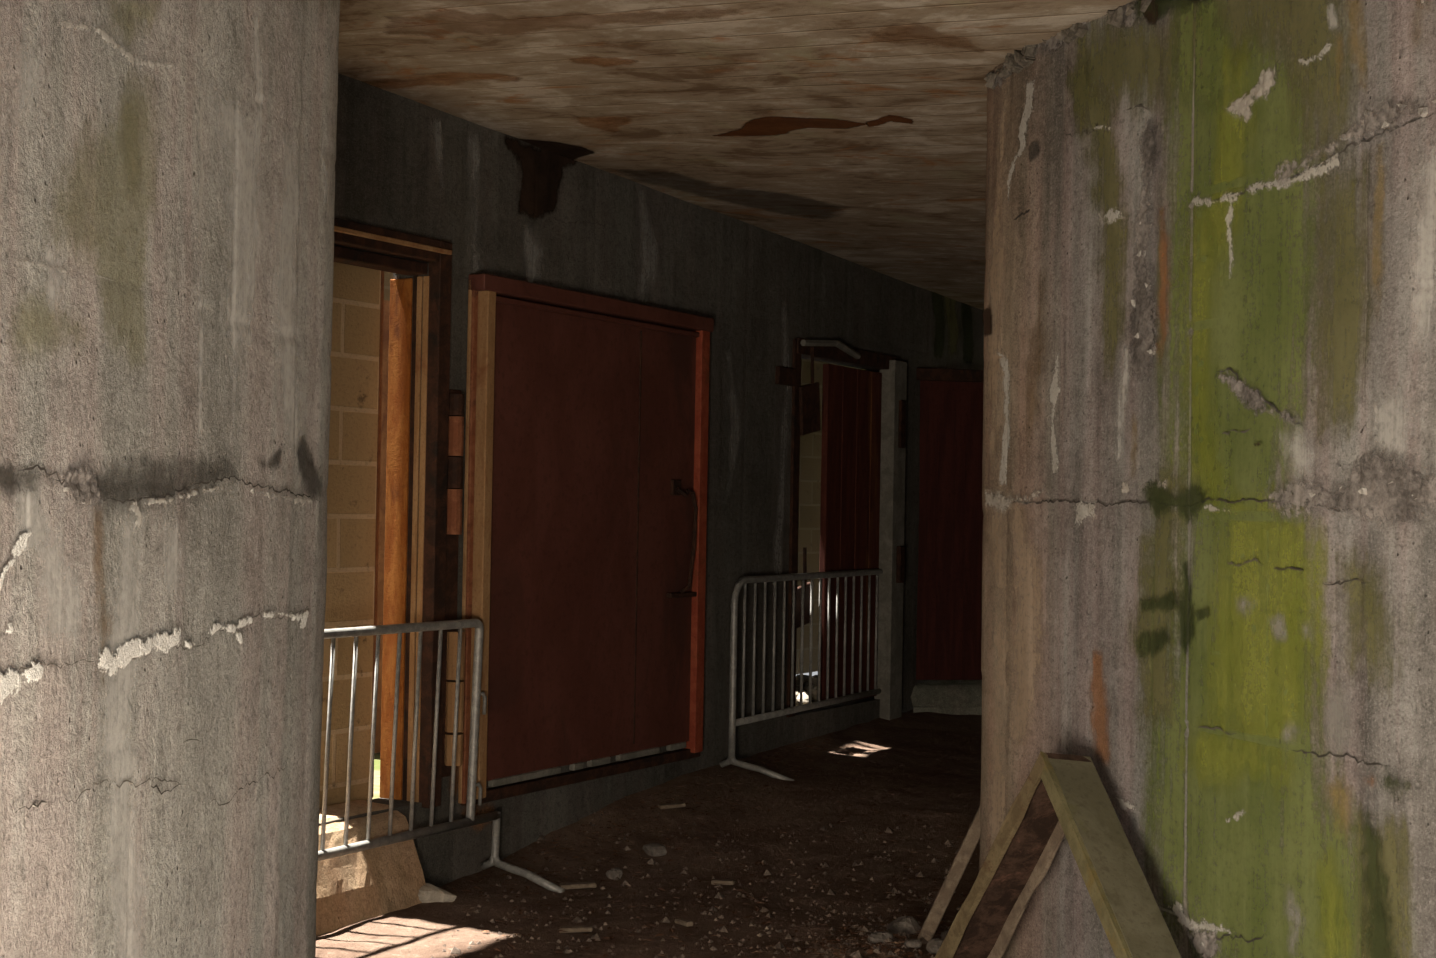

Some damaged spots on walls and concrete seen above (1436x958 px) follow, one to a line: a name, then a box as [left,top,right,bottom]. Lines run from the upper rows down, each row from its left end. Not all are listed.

leakage [504,135,594,283]
leakage [713,115,913,136]
spalling [1226,67,1275,123]
crack [1192,99,1436,279]
spalling [1413,157,1436,333]
leakage [944,186,1011,485]
crack [18,464,320,527]
crack [984,490,1358,512]
crack [0,530,314,705]
leakage [988,505,1041,846]
crack [11,768,285,813]
leakage [1321,811,1412,958]